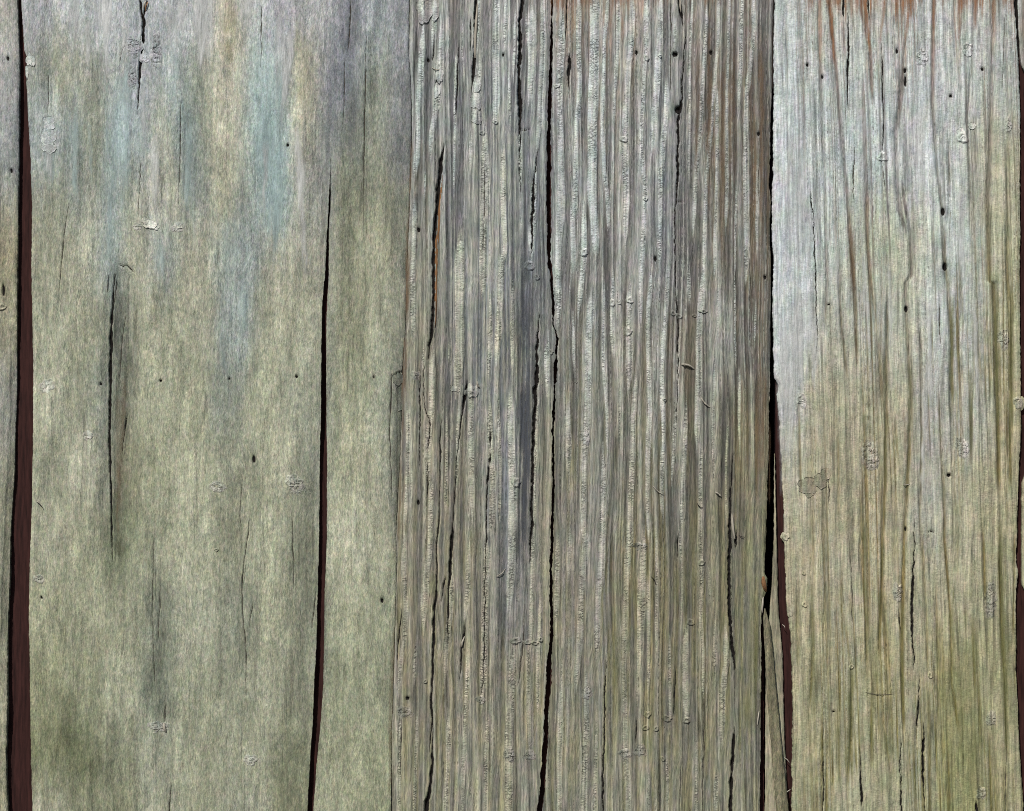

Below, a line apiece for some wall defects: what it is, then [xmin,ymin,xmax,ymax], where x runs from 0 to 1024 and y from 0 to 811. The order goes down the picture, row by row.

crack [108,265,133,560]
crack [389,147,491,811]
crack [670,0,686,421]
crack [898,518,932,811]